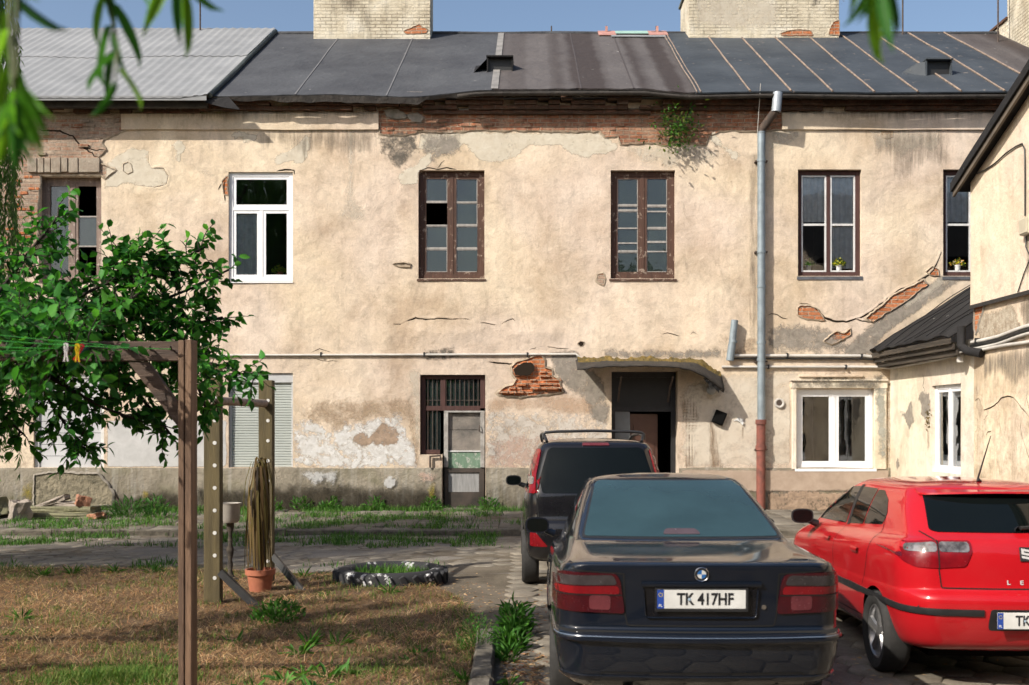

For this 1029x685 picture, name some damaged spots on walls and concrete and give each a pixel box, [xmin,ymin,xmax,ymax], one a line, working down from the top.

crack [41,130,104,157]
flaking render [377,107,783,185]
flaking render [0,112,168,275]
crack [393,314,517,325]
crack [491,345,569,365]
flaking render [796,304,826,322]
flaking render [823,328,852,346]
flaking render [864,266,944,323]
peeling [294,372,433,480]
crack [975,387,1029,457]